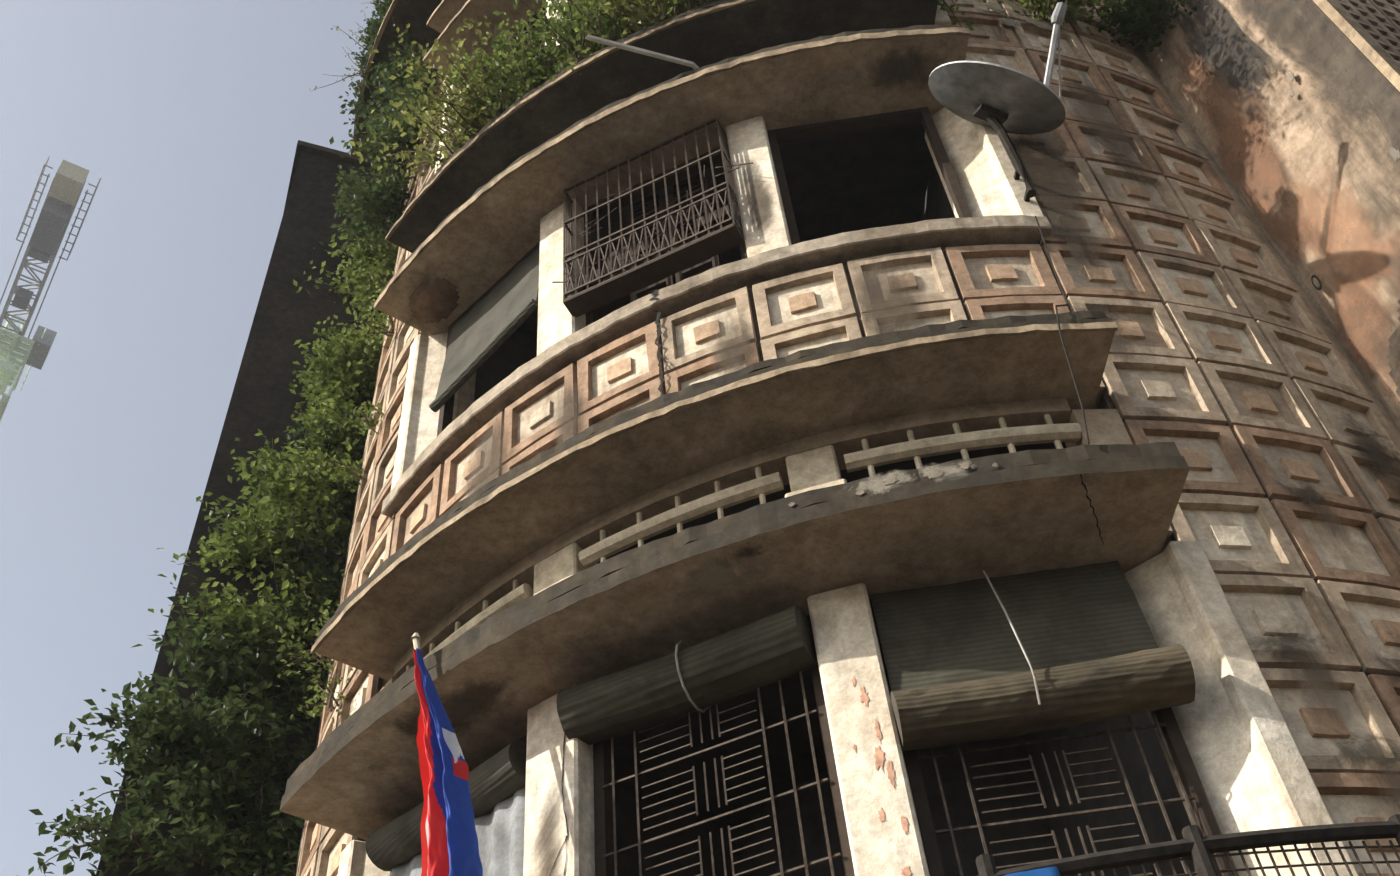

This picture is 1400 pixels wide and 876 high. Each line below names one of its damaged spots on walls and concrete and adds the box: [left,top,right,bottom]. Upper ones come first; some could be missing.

leakage [1069,71,1141,165]
leakage [1158,0,1400,242]
leakage [746,167,770,227]
leakage [1019,131,1103,268]
spalling [856,462,971,495]
crack [1080,474,1104,546]